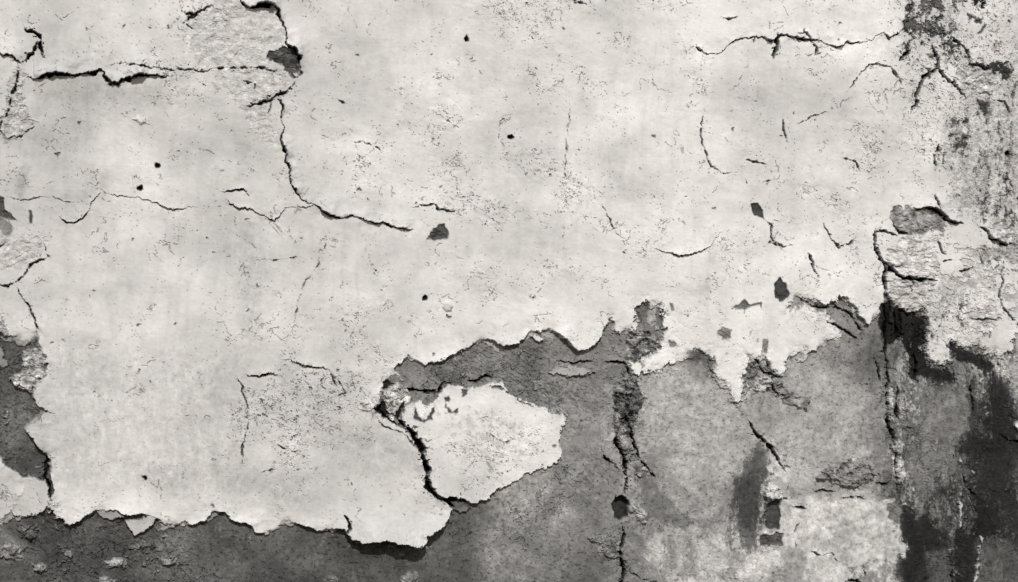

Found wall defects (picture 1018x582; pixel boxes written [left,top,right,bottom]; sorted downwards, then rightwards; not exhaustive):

crack [720,16,827,60]
crack [846,36,1011,116]
spalling [181,0,449,242]
spalling [0,196,17,221]
peeling [53,185,205,227]
spalling [750,203,764,219]
damp [632,0,1018,582]
peeling [883,188,1018,434]
peeling [0,277,975,582]
crack [601,415,657,494]
crack [748,419,798,474]
crack [763,217,1018,582]